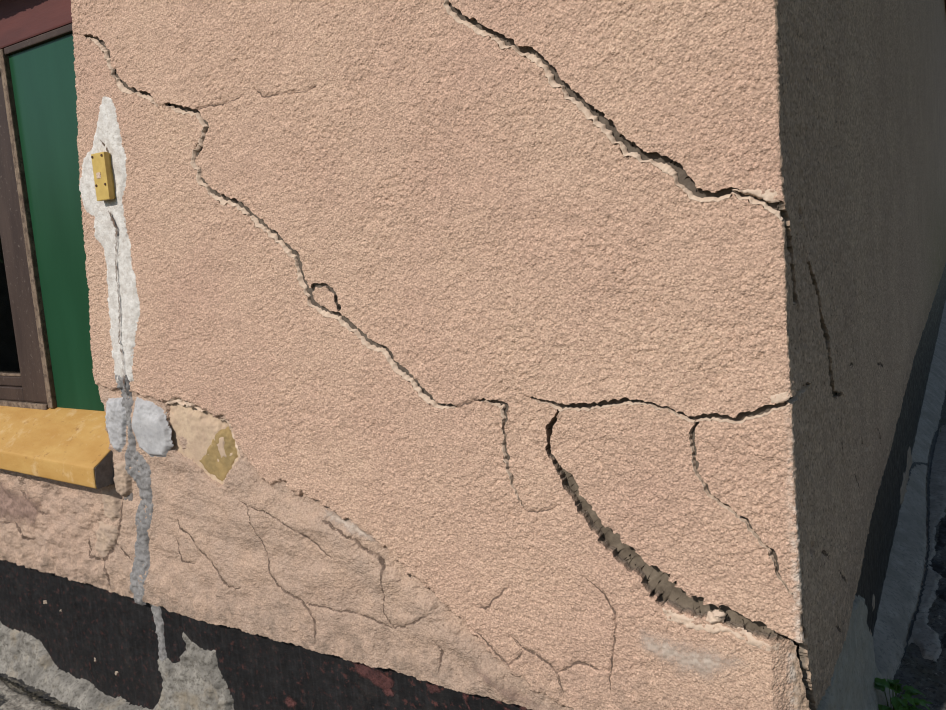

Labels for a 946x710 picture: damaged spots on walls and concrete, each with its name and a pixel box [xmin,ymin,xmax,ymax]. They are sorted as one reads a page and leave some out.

crack [88,0,842,691]
flaking render [165,398,241,484]
flaking render [662,608,780,651]